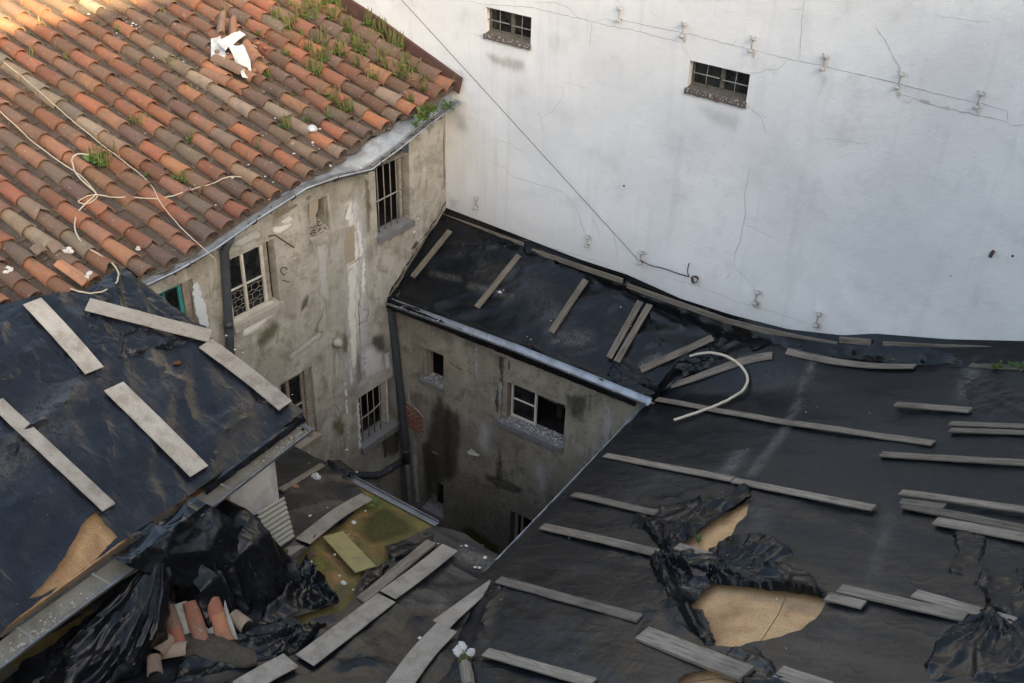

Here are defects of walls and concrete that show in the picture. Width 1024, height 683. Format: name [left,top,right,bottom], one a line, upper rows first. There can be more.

crack [471,0,1020,126]
peeling [192,282,209,328]
peeling [345,201,366,382]
water stain [413,399,460,503]
water stain [477,423,521,492]